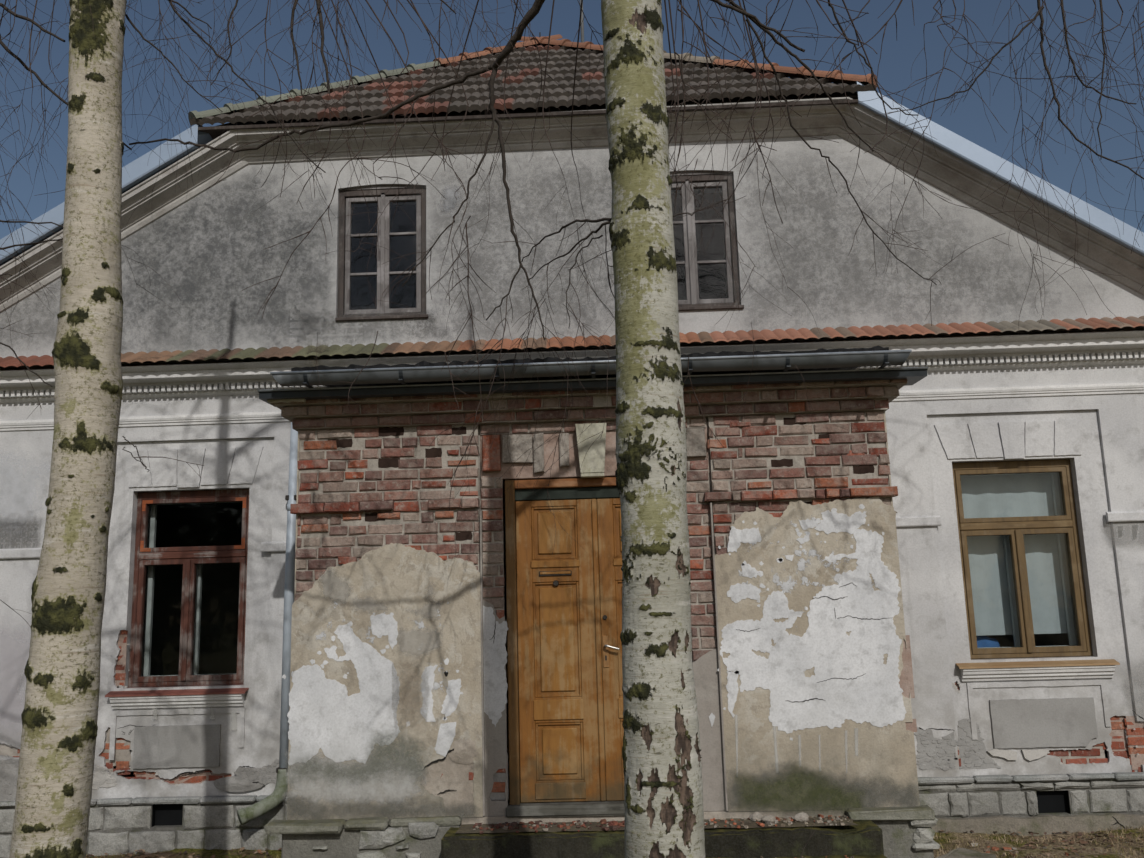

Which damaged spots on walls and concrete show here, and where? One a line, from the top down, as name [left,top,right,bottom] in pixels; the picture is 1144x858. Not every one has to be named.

flaking render [294,420,617,727]
crack [812,583,884,620]
peeling [685,411,1144,772]
peeling [92,602,474,815]
crack [787,675,863,702]
leakage [296,738,421,779]
leakage [288,798,474,819]
leakage [731,772,917,808]